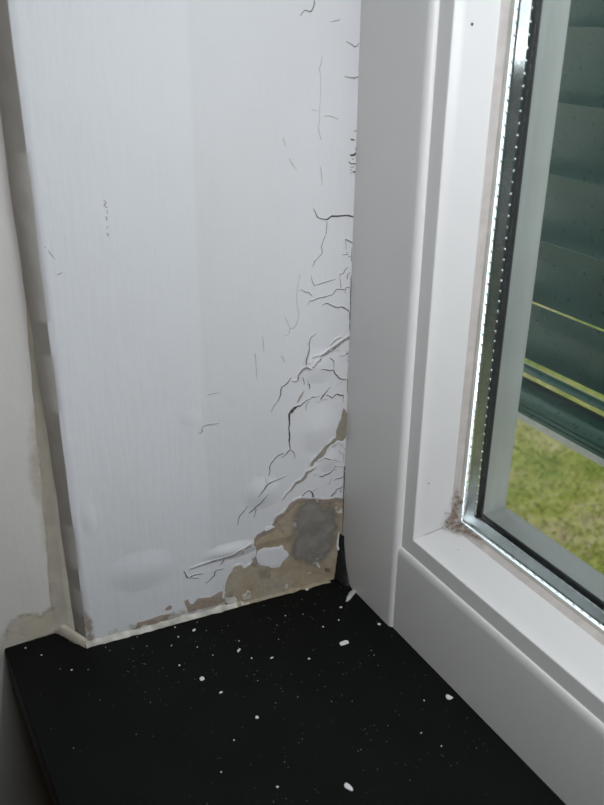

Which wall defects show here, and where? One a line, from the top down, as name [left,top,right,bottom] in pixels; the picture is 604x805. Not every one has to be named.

crack [299,0,316,17]
crack [312,55,339,140]
crack [345,73,359,81]
crack [348,129,357,174]
crack [237,208,354,535]
crack [183,542,254,584]
peeling [124,495,343,631]
damp [292,501,337,563]